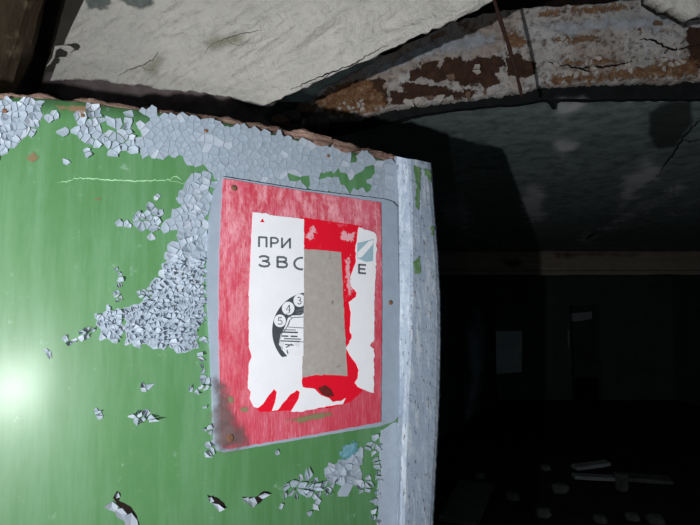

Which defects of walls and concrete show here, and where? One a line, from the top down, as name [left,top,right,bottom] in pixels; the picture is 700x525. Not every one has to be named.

crack [118,53,158,76]
crack [205,30,259,53]
spalling [353,32,537,108]
crack [548,60,638,72]
crack [640,38,700,63]
rust [313,73,386,118]
peeling [0,95,59,155]
peeling [56,103,398,395]
peeling [128,409,158,426]
peeling [279,434,383,524]
peeling [104,491,139,525]
peeling [207,495,226,512]